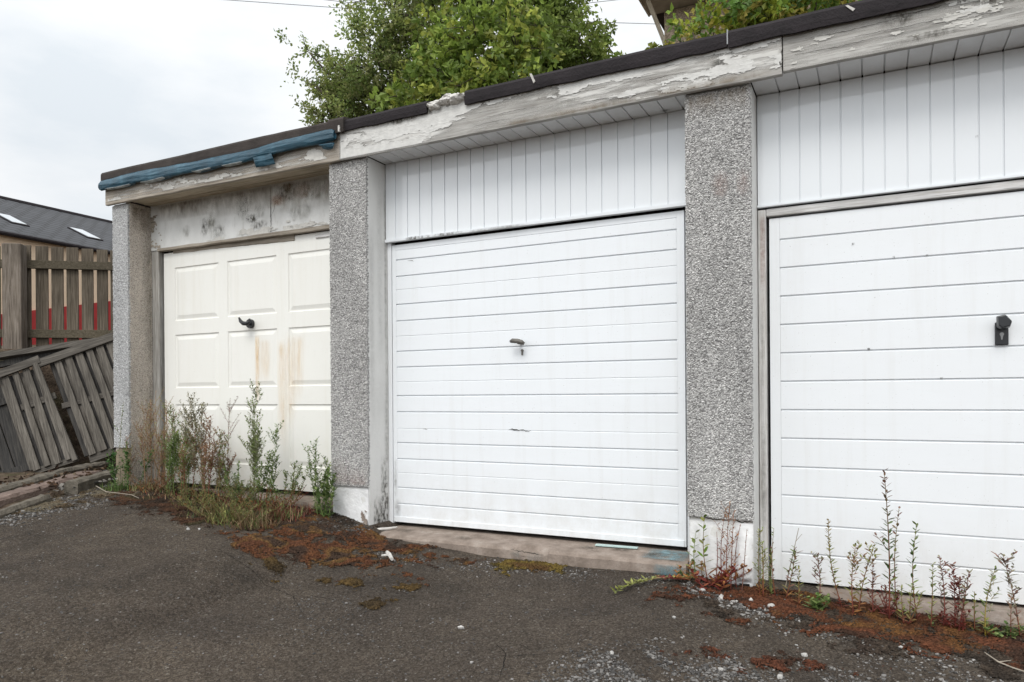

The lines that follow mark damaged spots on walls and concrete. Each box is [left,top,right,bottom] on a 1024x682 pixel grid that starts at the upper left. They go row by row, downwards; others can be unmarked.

peeling [340,0,1024,159]
peeling [108,147,326,202]